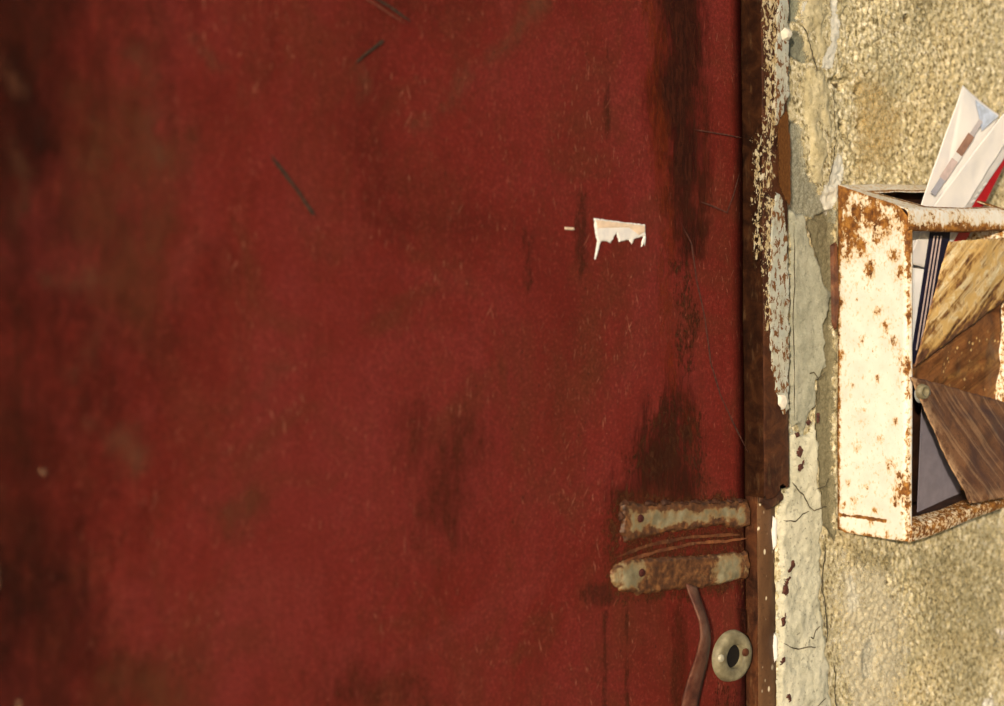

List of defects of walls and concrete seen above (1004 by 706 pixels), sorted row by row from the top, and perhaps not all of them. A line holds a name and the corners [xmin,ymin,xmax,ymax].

corrosion [647,0,706,377]
spalling [750,0,844,540]
corrosion [603,487,744,604]